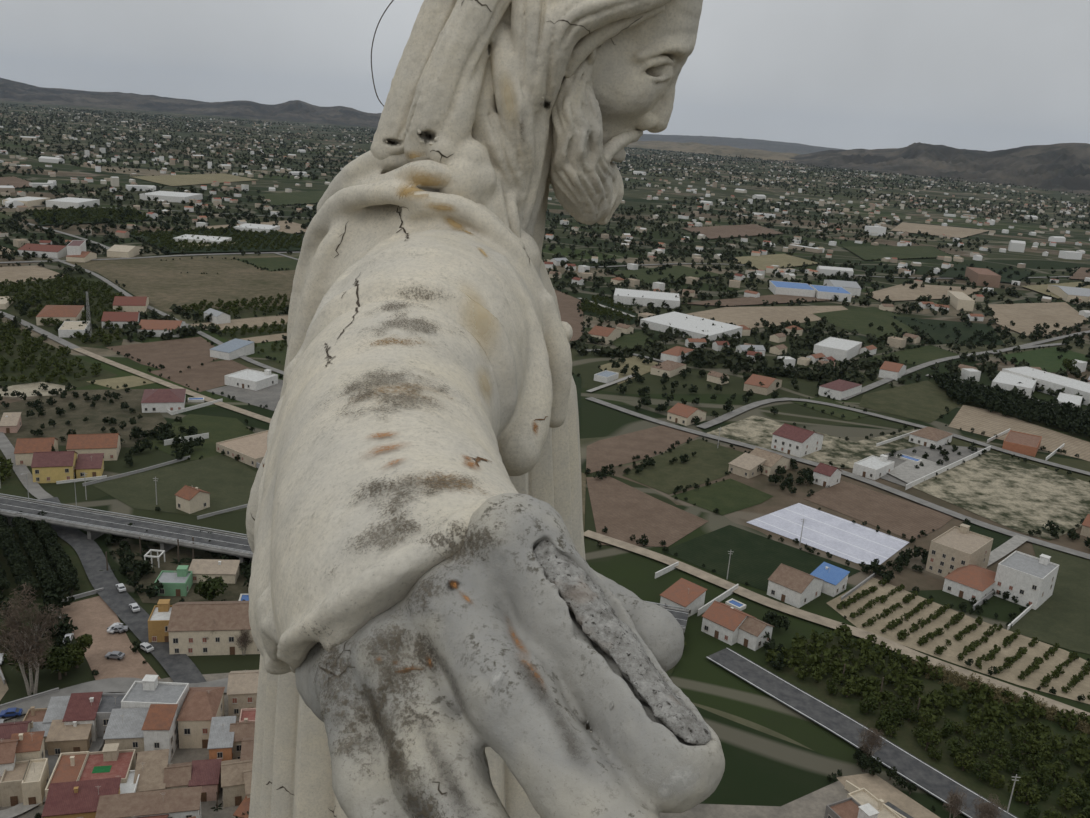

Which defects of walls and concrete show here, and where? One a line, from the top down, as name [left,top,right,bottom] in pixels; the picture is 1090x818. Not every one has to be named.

spalling [417,129,439,145]
crack [396,206,409,241]
crack [324,274,360,366]
damp [420,473,480,490]